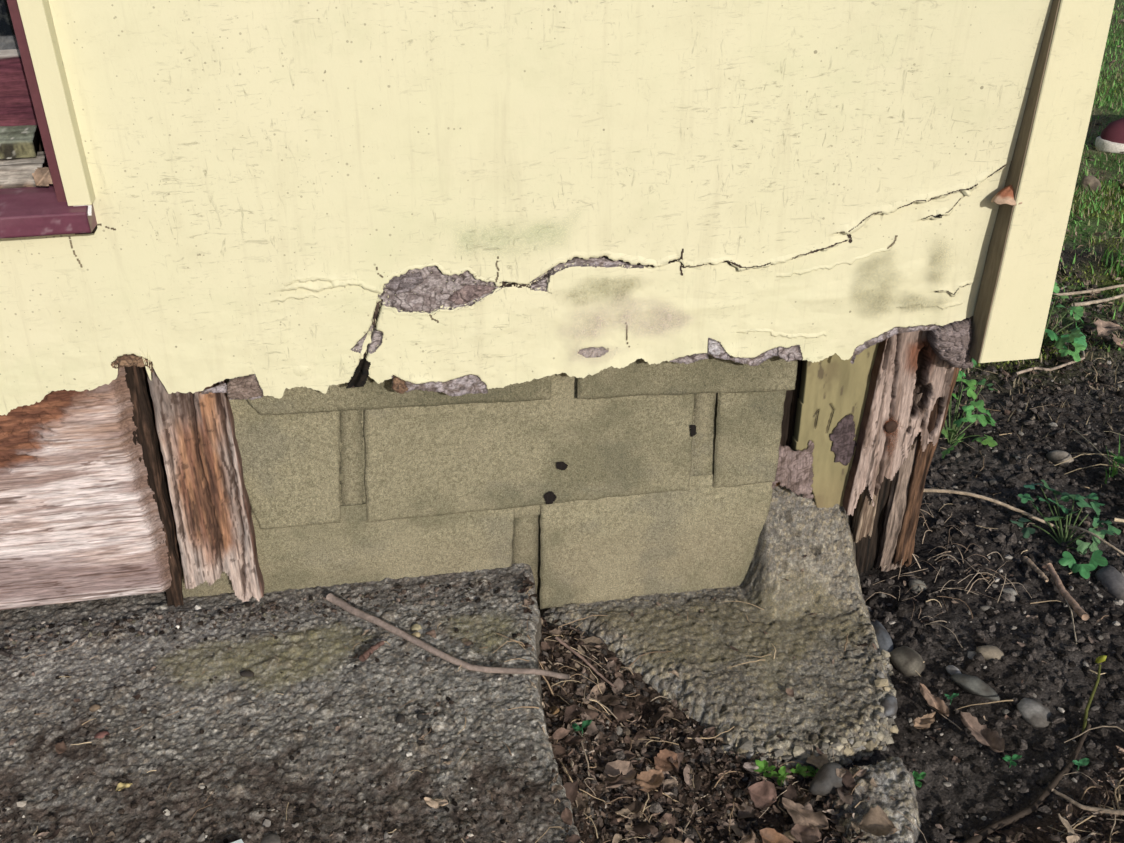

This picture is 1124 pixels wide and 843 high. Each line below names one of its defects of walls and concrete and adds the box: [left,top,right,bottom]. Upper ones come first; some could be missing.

spalling [376,263,502,317]
peeling [111,354,153,372]
peeling [201,374,264,400]
crack [346,267,383,388]
peeling [392,374,488,396]
peeling [578,346,609,358]
peeling [670,338,803,366]
spalling [850,318,974,370]
peeling [830,414,857,466]
peeling [772,440,814,499]